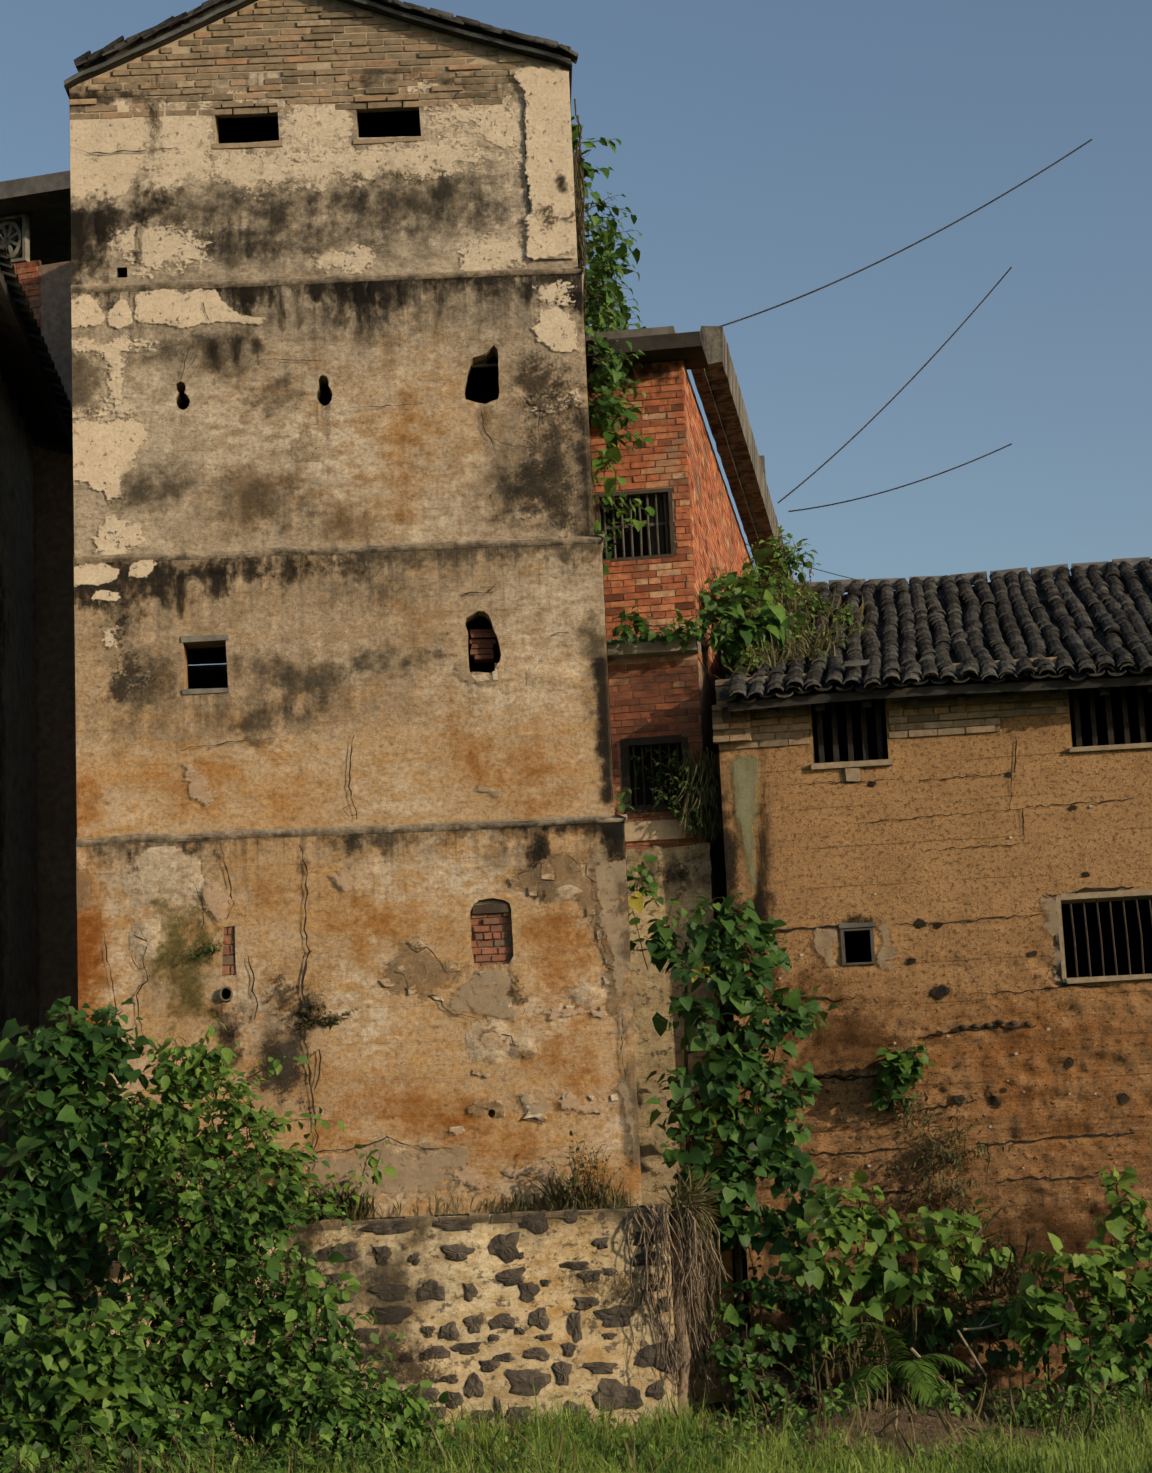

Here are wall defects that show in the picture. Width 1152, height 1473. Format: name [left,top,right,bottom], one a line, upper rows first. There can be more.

water stain [71,209,118,285]
peeling [70,65,581,601]
water stain [307,275,398,308]
water stain [525,119,595,537]
water stain [74,558,257,606]
water stain [532,551,640,1168]
crack [299,845,450,1171]
spalling [379,940,523,1039]
crack [801,995,856,1003]
crack [918,984,1105,1039]
crack [783,1074,876,1085]
crack [976,1132,1134,1183]